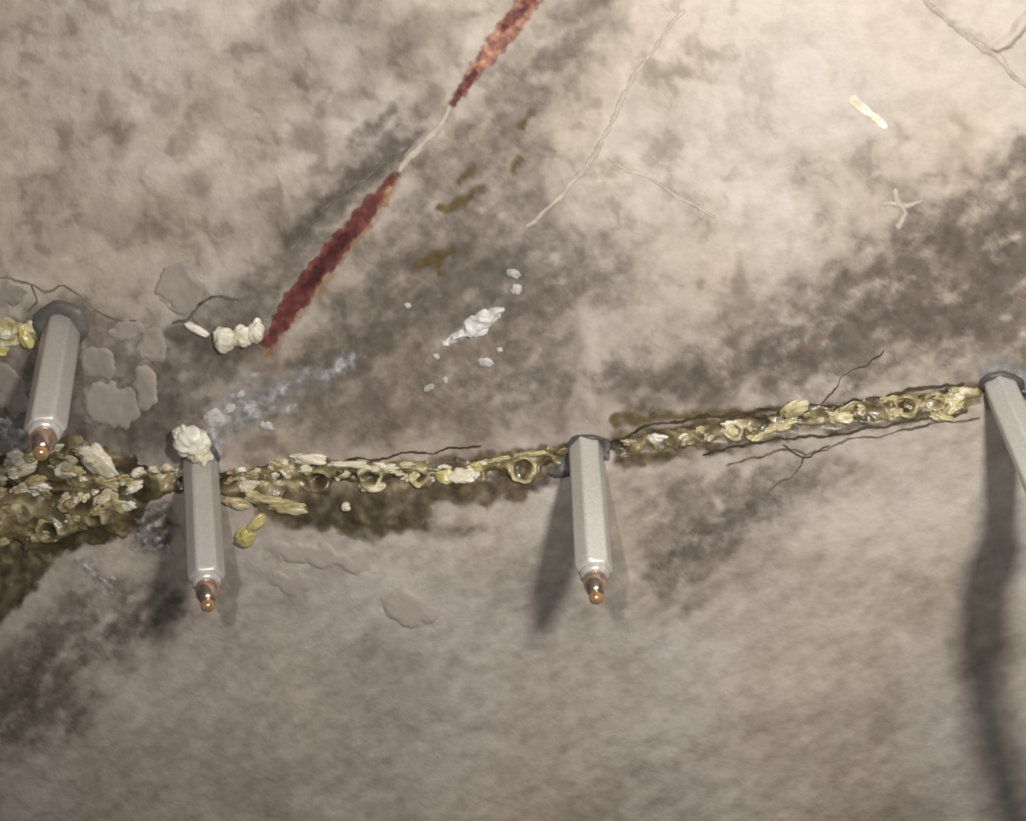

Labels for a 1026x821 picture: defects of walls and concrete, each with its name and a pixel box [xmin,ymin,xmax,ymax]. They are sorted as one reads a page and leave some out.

rust [450,0,542,106]
crack [0,277,136,322]
crack [171,295,241,328]
rust [260,172,399,356]
leakage [112,109,607,458]
leakage [604,185,1026,396]
crack [316,445,481,482]
leakage [610,391,948,468]
crack [610,350,984,491]
leakage [968,384,988,406]
leakage [128,503,174,552]
leakage [0,534,125,622]